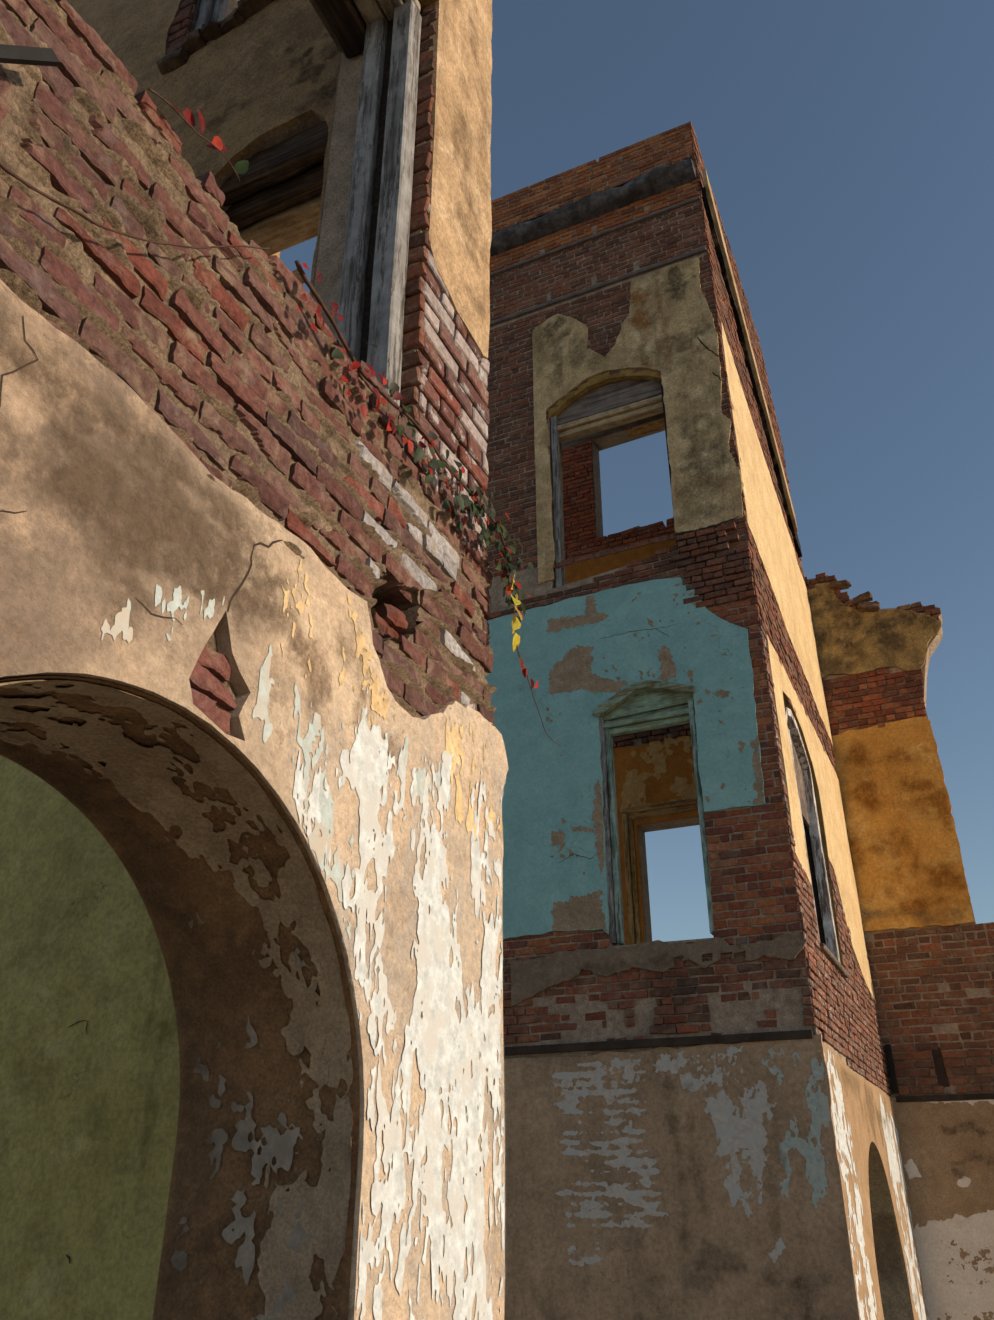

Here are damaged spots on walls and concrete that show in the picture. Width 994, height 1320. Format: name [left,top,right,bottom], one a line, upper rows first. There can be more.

crack [0,316,39,407]
crack [136,598,183,625]
crack [228,540,283,612]
peeling [546,583,744,732]
peeling [620,734,725,815]
peeling [737,735,764,804]
peeling [0,559,505,1320]
peeling [552,1045,877,1320]
peeling [877,1095,994,1320]